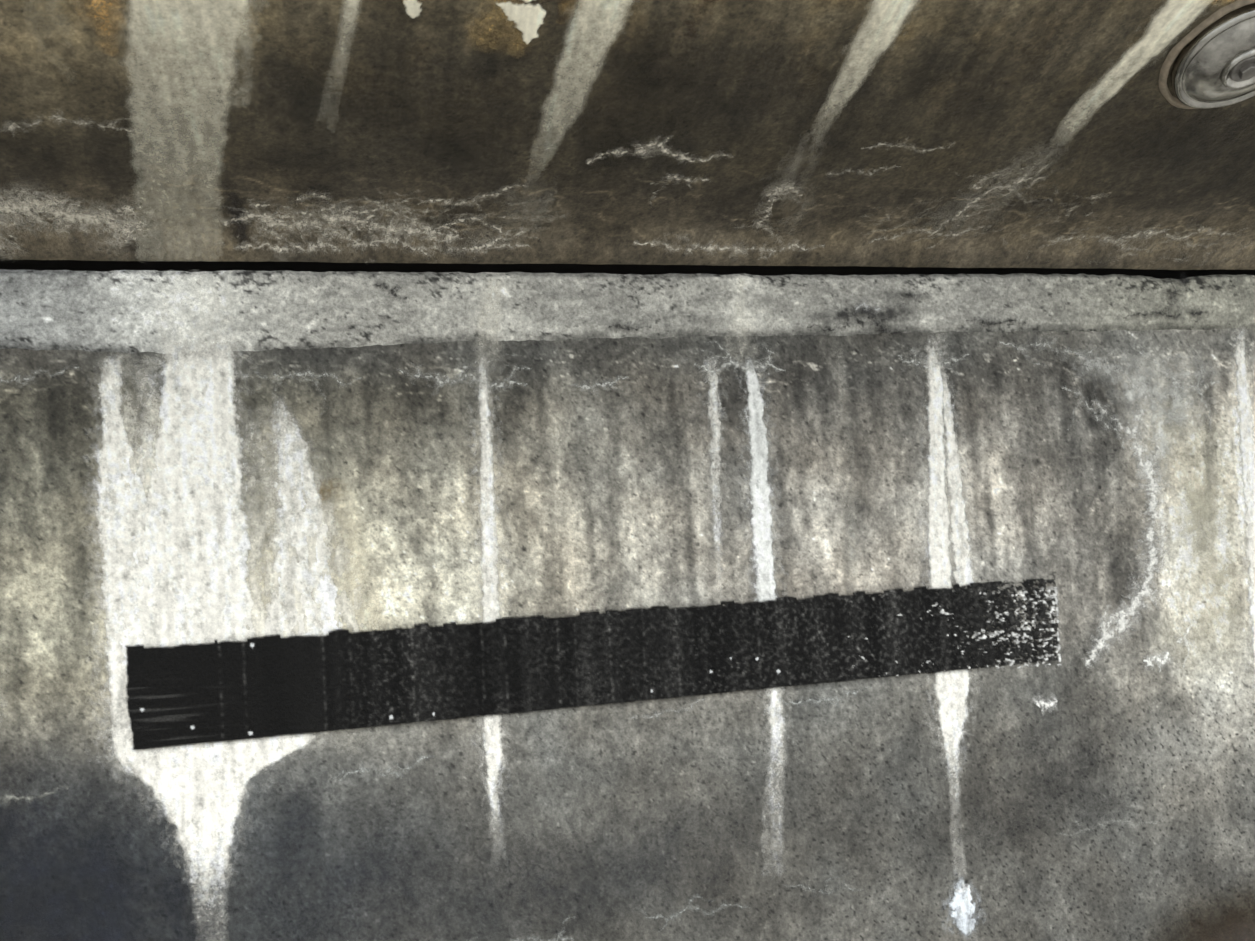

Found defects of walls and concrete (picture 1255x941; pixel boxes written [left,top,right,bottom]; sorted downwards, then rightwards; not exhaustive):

peeling [403,0,422,18]
peeling [496,0,546,44]
water stain [1075,0,1213,114]
crack [587,138,713,181]
crack [807,317,968,369]
crack [966,319,1092,359]
water stain [746,363,777,602]
water stain [916,349,974,604]
crack [1065,352,1216,667]
water stain [95,346,375,901]
water stain [484,715,503,813]
water stain [935,666,970,781]